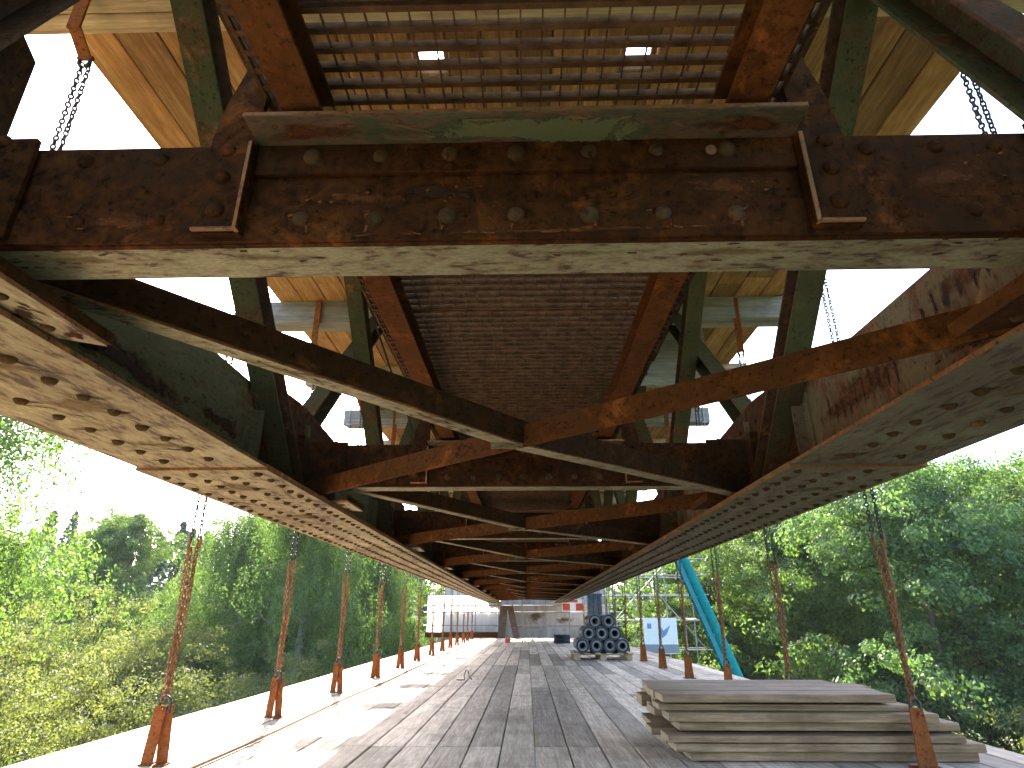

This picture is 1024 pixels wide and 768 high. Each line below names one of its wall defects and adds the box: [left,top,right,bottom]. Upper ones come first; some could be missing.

peeling [390,114,643,142]
corrosion [11,301,50,325]
corrosion [821,361,899,422]